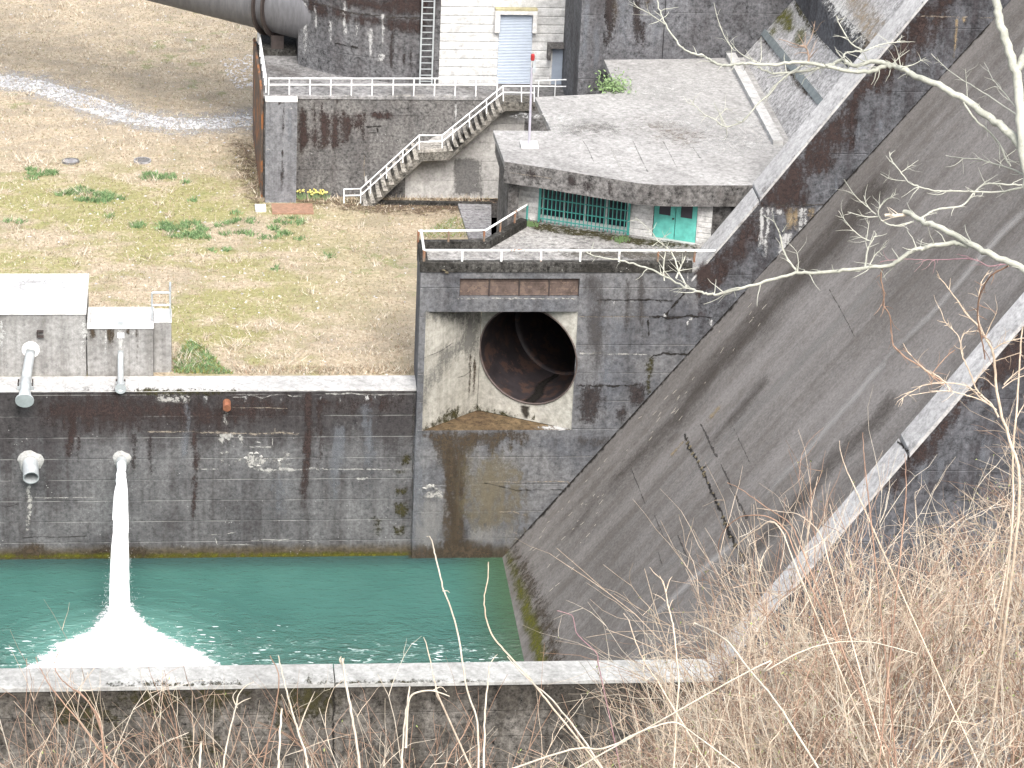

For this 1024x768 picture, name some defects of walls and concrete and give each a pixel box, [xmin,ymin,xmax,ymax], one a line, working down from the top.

leakage [929,215,1022,317]
leakage [635,186,884,467]
leakage [131,434,152,475]
leakage [191,430,200,520]
spalling [221,451,290,468]
leakage [301,392,323,499]
leakage [416,425,571,549]
crack [458,273,745,549]
crack [684,424,760,598]